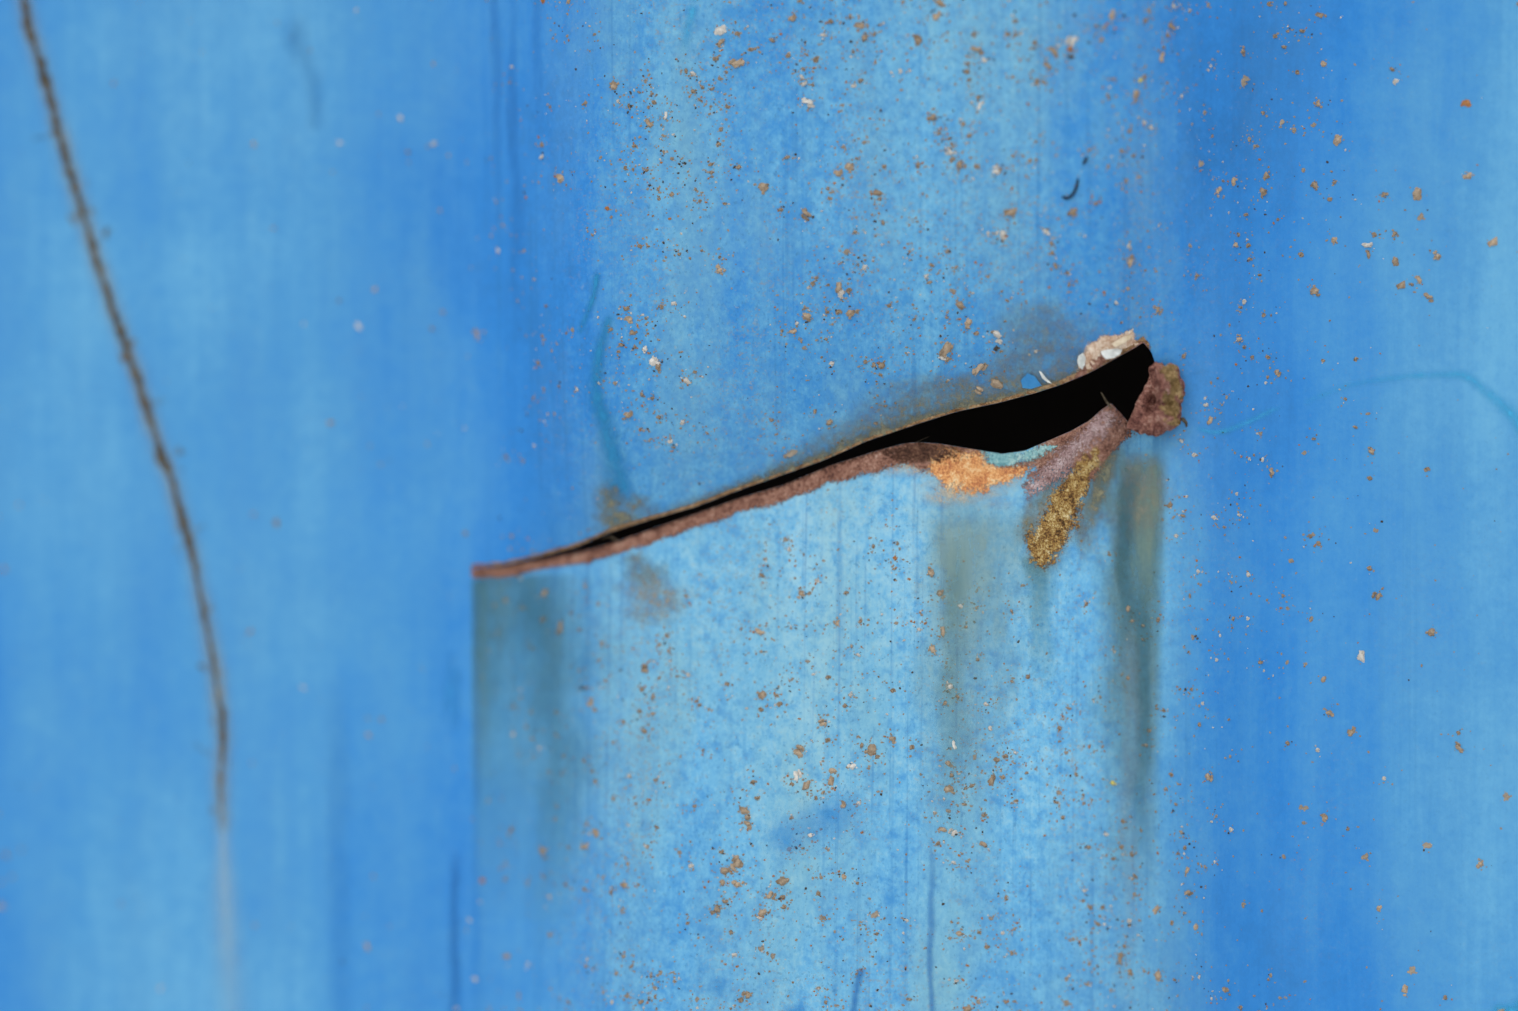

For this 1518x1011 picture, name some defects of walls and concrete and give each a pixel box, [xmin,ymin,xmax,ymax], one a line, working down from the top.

corrosion [1068,354,1107,381]
corrosion [470,404,1131,614]
corrosion [1087,455,1162,694]